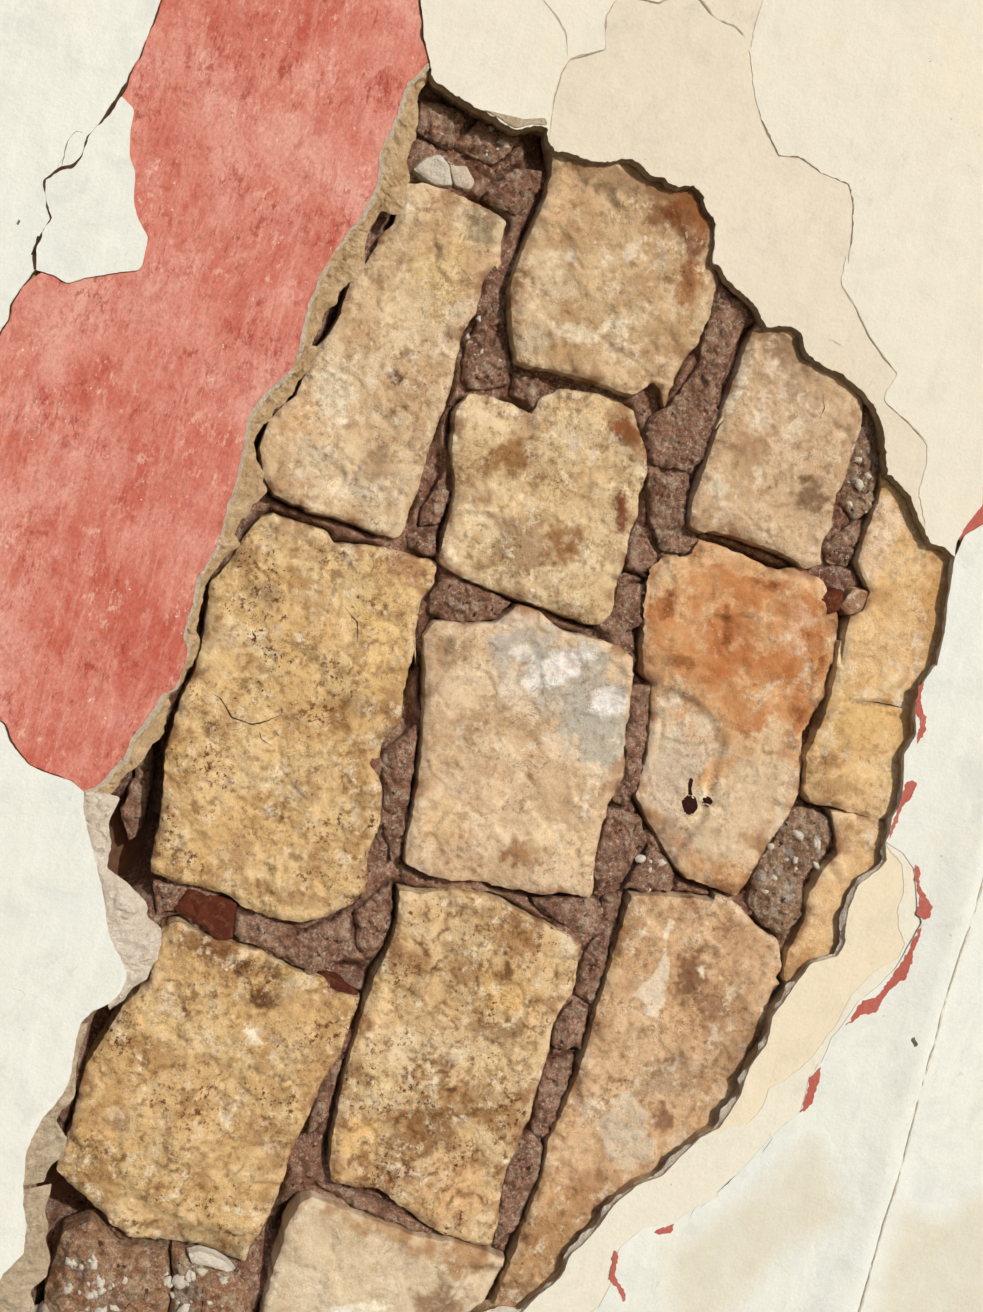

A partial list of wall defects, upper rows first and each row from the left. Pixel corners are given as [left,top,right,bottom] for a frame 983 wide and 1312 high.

crack [544,0,616,136]
crack [0,0,163,335]
crack [759,111,854,247]
crack [833,287,895,371]
peeling [0,0,954,1026]
peeling [959,505,983,541]
crack [0,720,76,784]
spalling [485,683,927,1312]
spalling [0,1023,89,1312]
peeling [187,1246,235,1272]
water stain [642,1046,864,1312]
water stain [859,1177,983,1312]